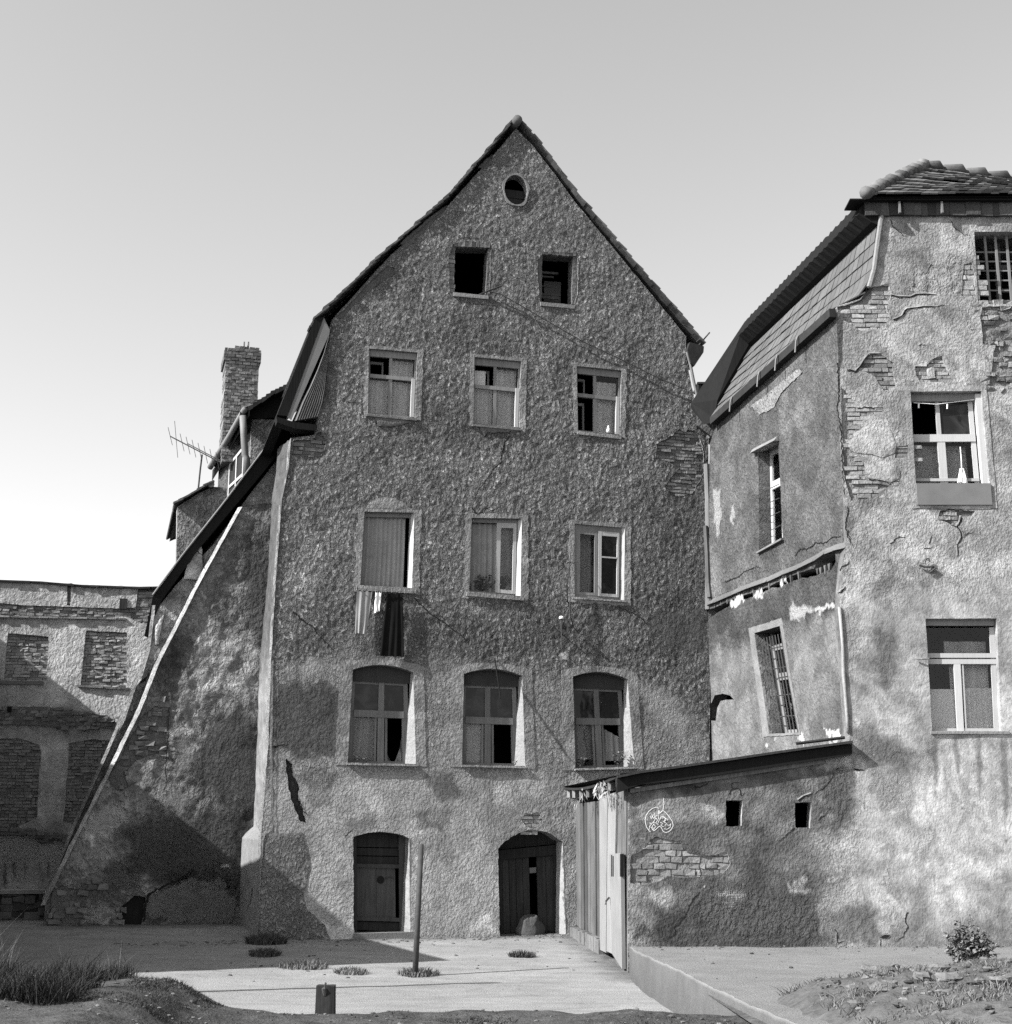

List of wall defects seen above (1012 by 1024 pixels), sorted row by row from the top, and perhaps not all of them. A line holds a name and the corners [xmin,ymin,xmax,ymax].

flaking render [838,284,891,331]
crack [891,292,945,321]
flaking render [908,254,1012,393]
flaking render [751,369,802,414]
flaking render [841,355,955,501]
flaking render [655,429,735,536]
crack [795,352,901,593]
crack [890,509,972,555]
flaking render [730,588,764,608]
flaking render [790,603,835,620]
flaking render [109,696,191,792]
flaking render [630,836,730,888]